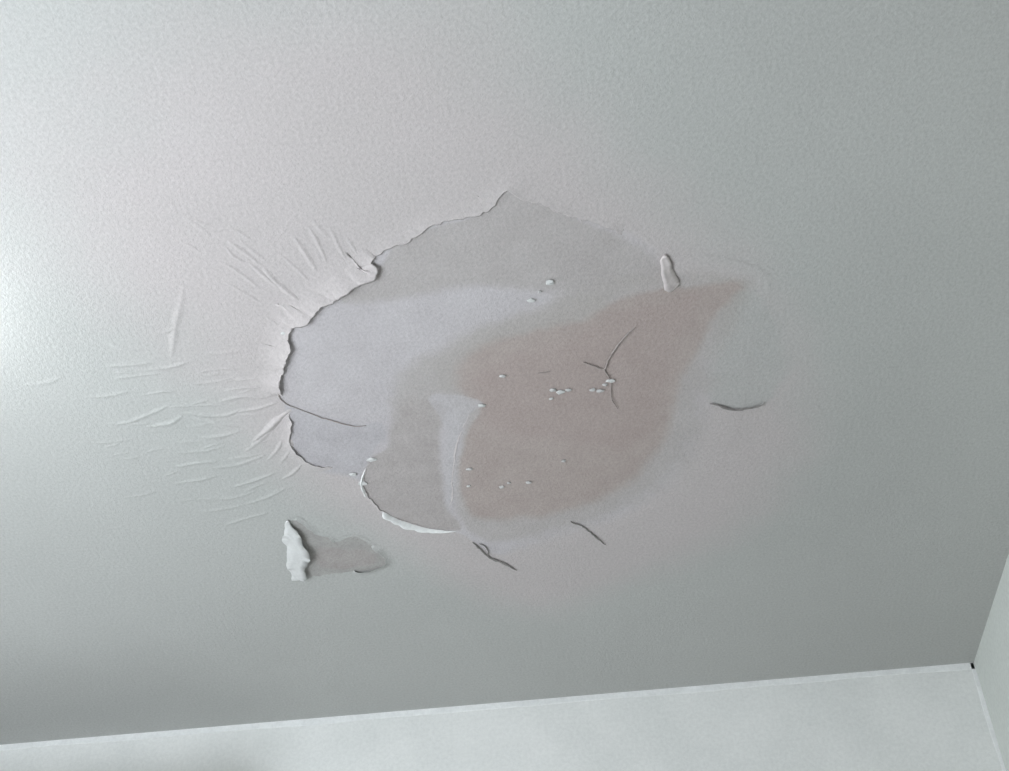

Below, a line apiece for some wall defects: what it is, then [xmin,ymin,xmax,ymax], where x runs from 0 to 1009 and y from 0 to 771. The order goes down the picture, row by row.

leakage [0,0,922,649]
peeling [250,172,680,560]
crack [710,402,765,411]
peeling [282,515,395,581]
crack [473,543,515,570]